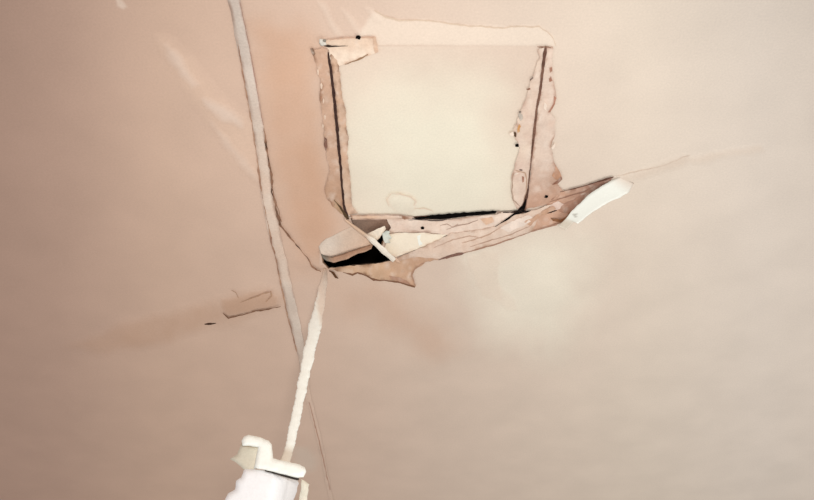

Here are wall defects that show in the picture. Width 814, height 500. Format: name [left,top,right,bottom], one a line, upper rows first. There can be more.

crack [263,129,338,279]
peeling [558,177,634,230]
flaking render [319,218,391,269]